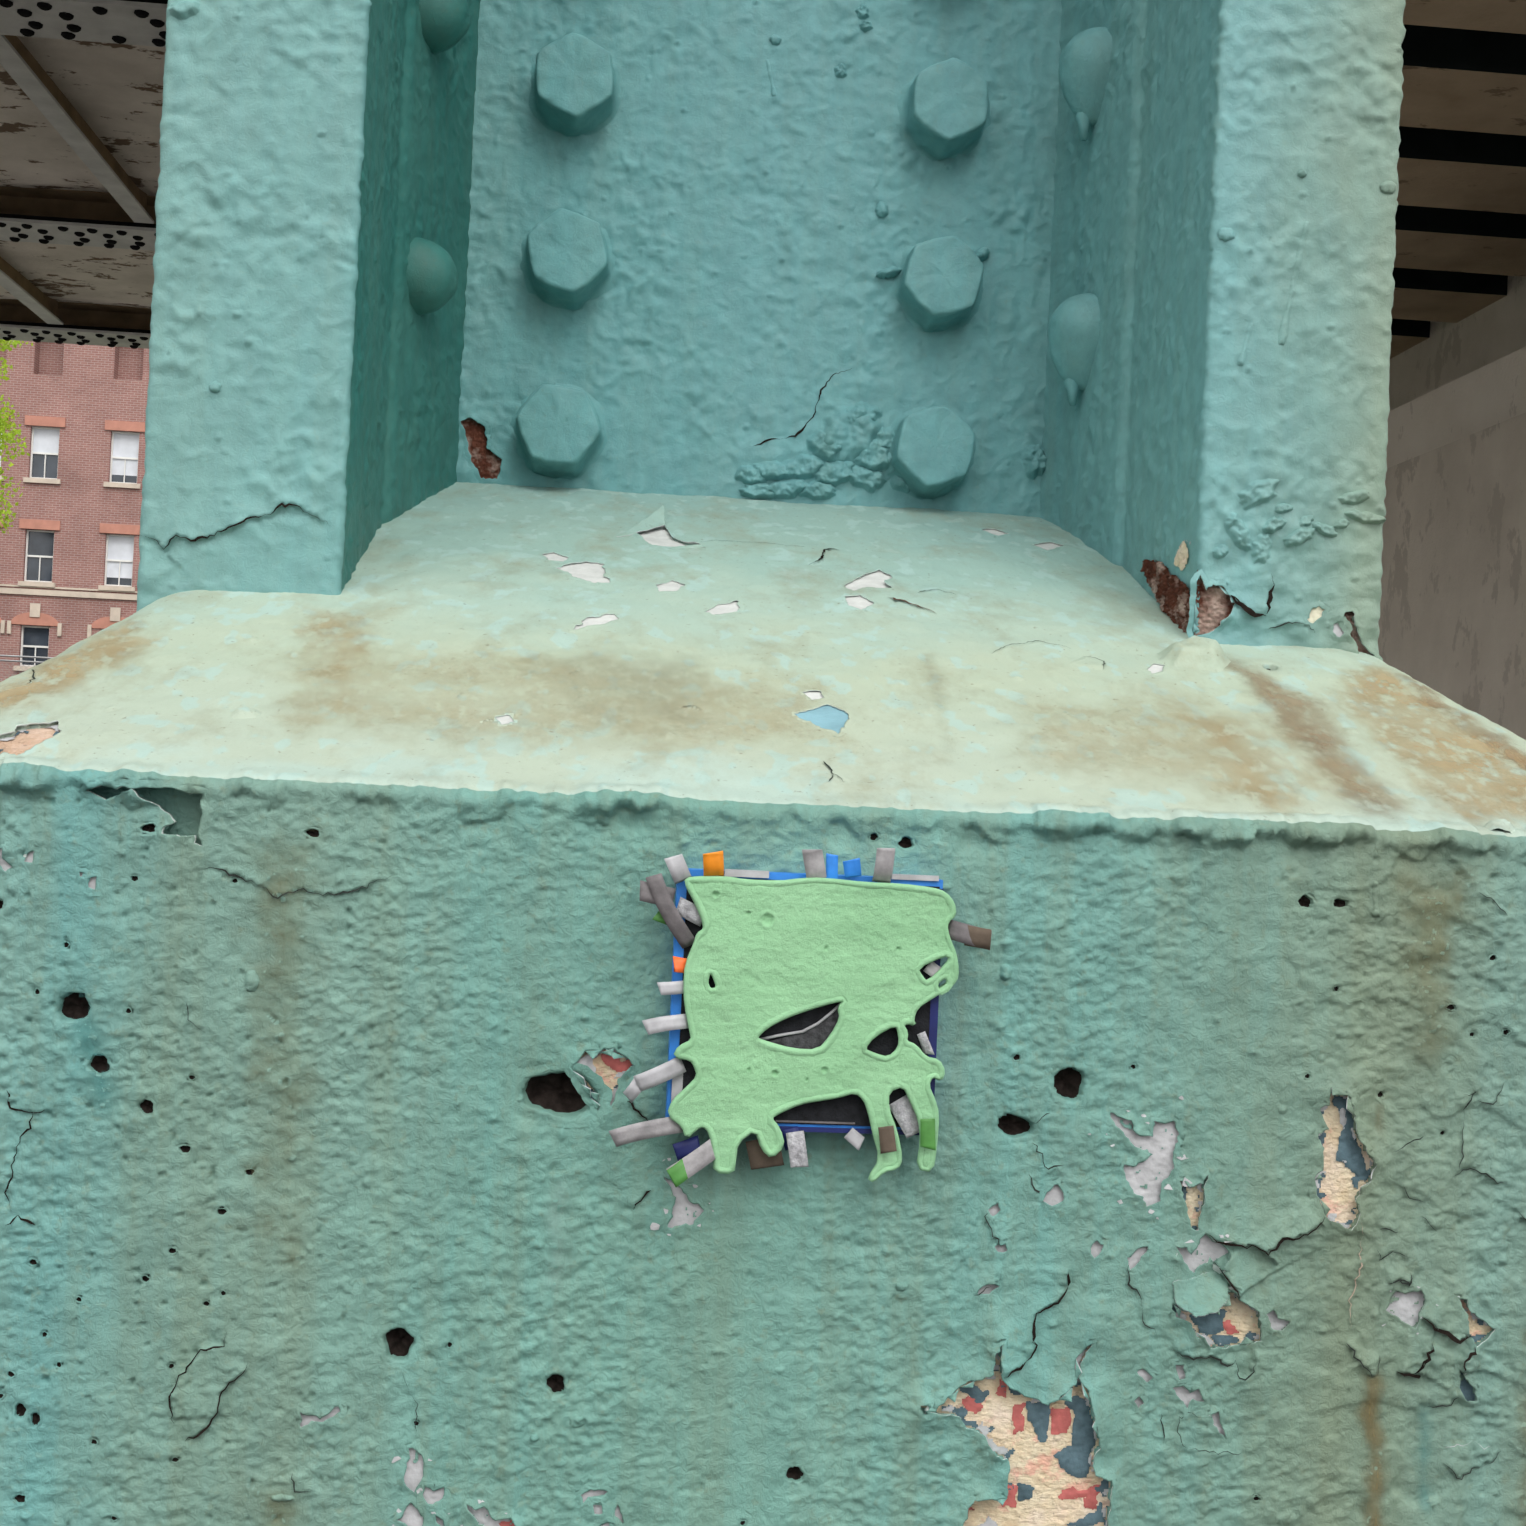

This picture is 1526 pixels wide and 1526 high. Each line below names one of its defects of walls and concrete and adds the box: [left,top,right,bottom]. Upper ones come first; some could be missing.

crack [145,503,329,549]
peeling [839,569,898,612]
corrosion [1363,674,1468,717]
peeling [0,718,69,760]
corrosion [1259,681,1382,804]
corrosion [1429,735,1526,773]
crack [206,867,392,899]
peeling [1307,1080,1383,1236]
peeling [1083,1096,1297,1443]
crack [168,1332,247,1440]
peeling [921,1338,1119,1526]
peeling [389,1441,522,1526]